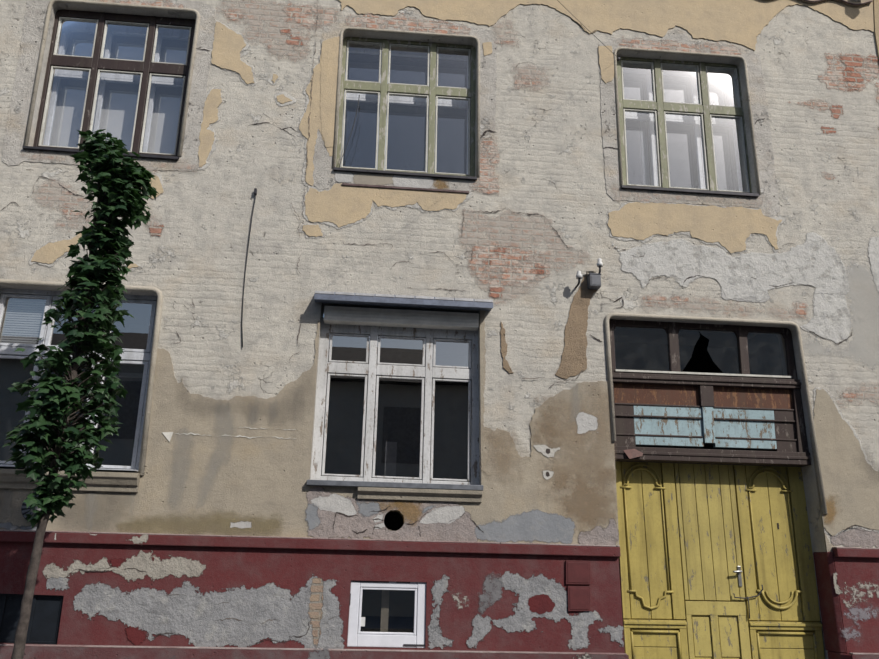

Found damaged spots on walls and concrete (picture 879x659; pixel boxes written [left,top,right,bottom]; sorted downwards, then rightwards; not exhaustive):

peeling [0,0,97,282]
peeling [85,0,879,548]
peeling [43,534,345,659]
peeling [428,574,468,649]
peeling [466,571,625,659]
peeling [833,572,879,639]